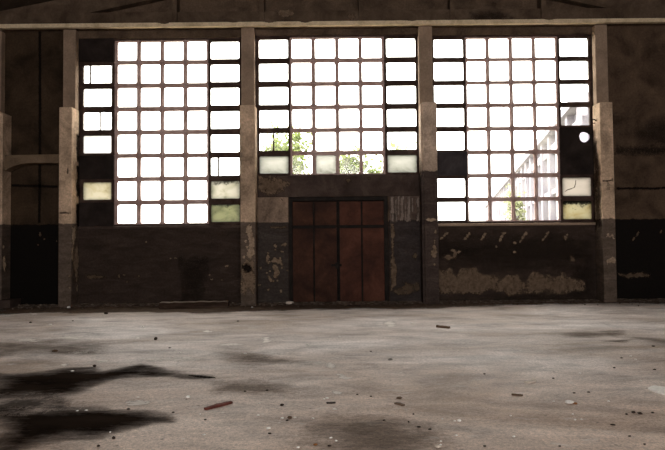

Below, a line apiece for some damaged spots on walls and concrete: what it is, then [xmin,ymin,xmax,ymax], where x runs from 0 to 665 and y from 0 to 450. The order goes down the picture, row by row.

water stain [391,196,420,222]
peeling [240,224,288,295]
peeling [390,224,420,295]
peeling [431,230,585,296]